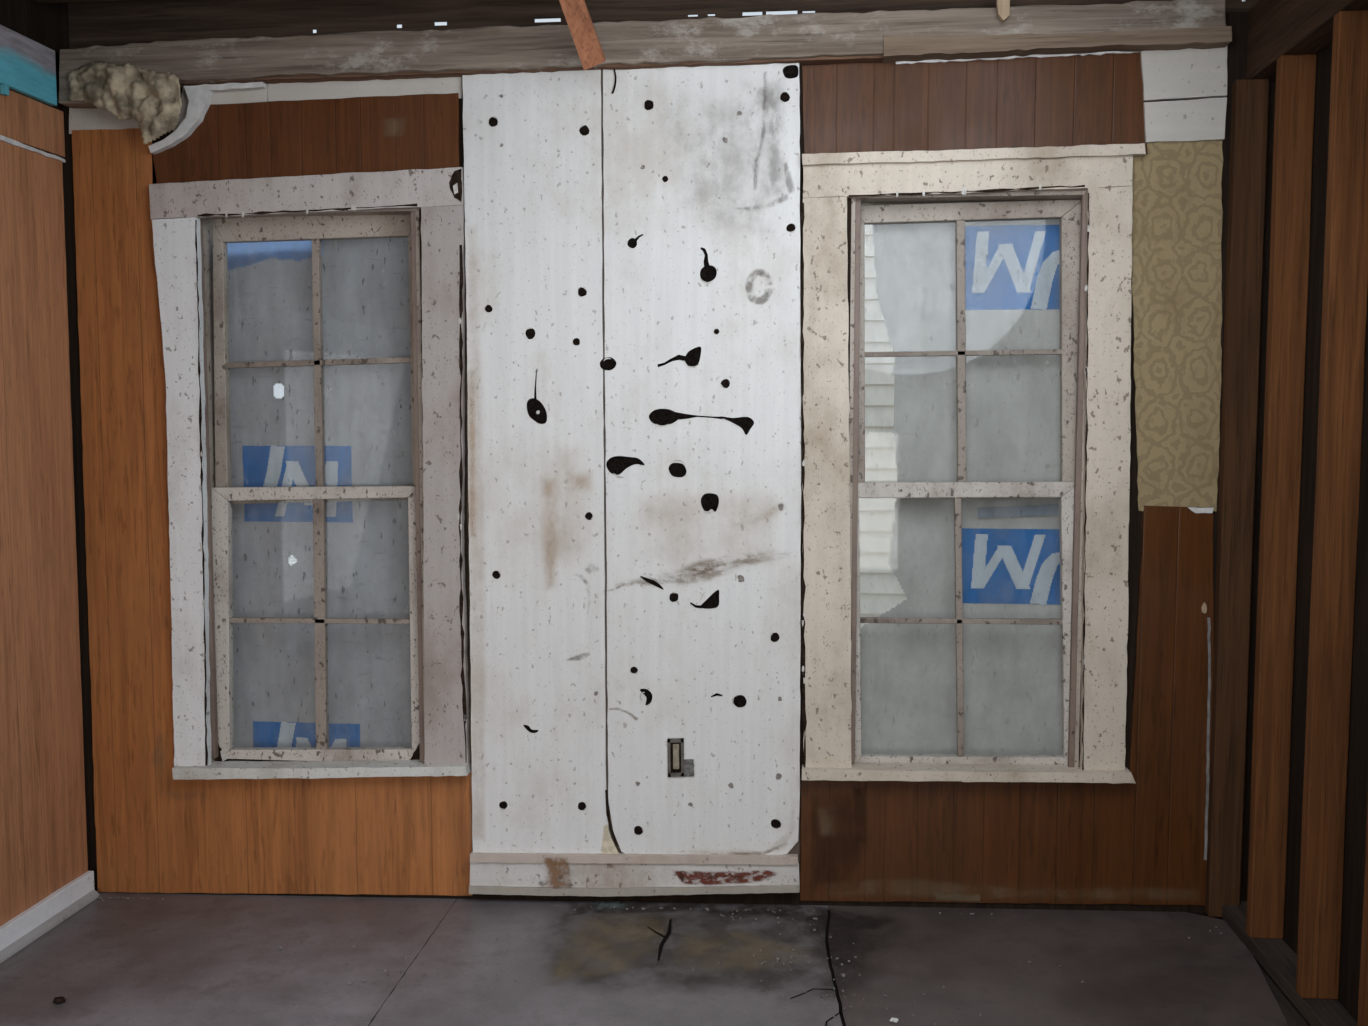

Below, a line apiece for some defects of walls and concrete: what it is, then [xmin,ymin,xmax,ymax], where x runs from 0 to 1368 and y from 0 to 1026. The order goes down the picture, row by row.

damp [558,901,884,988]
crack [790,910,846,1026]